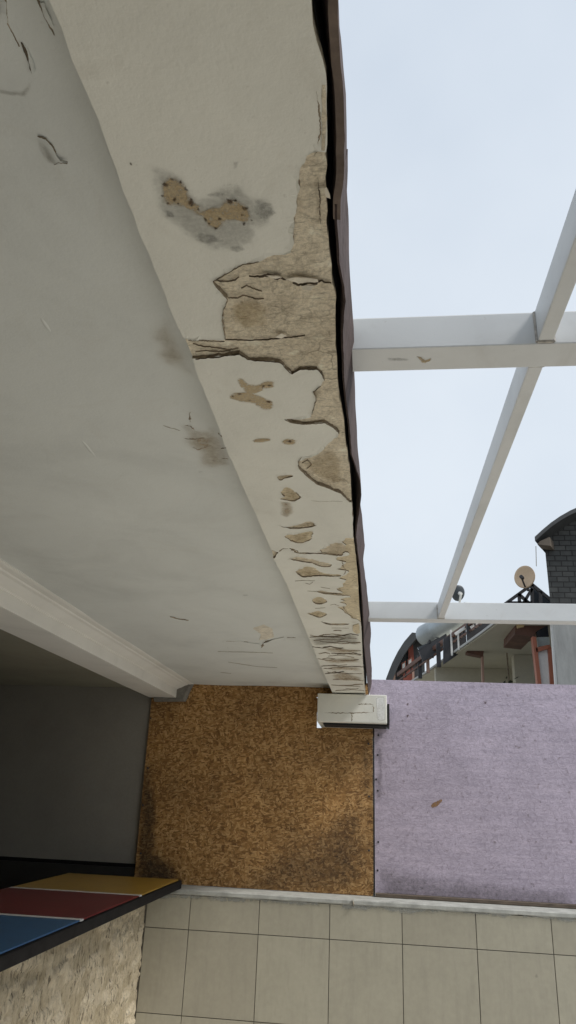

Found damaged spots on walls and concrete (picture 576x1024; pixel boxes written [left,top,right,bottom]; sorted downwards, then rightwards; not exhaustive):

spalling [185,152,352,502]
peeling [272,522,361,625]